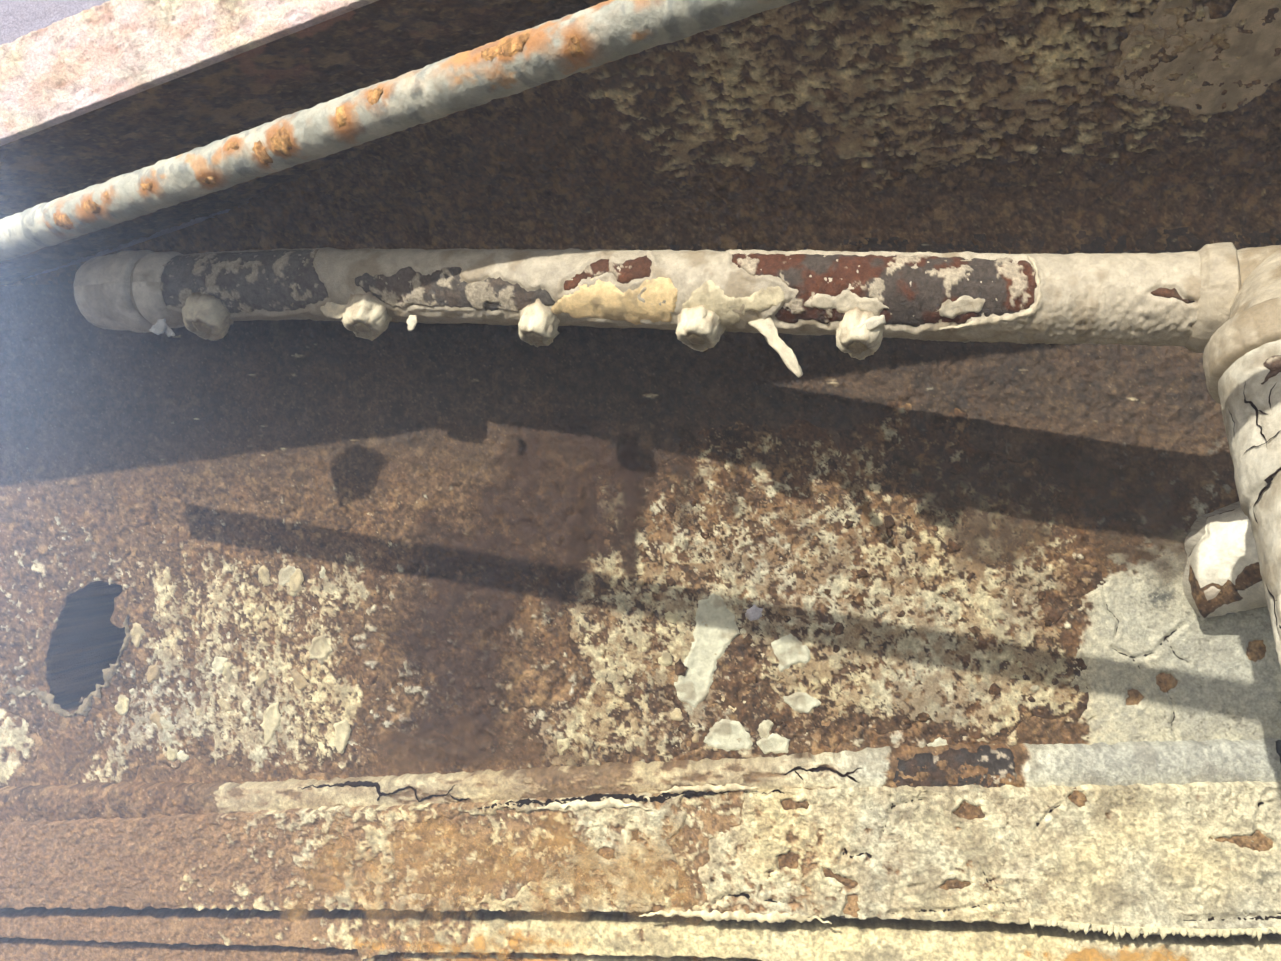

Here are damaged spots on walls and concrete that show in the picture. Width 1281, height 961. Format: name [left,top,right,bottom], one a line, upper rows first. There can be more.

peeling [1115,0,1281,116]
peeling [352,255,652,331]
peeling [732,253,1042,378]
crack [1228,383,1281,523]
peeling [514,400,1106,767]
peeling [63,512,399,785]
rust [675,658,688,676]
rust [1246,640,1266,662]
crack [299,781,469,802]
crack [744,766,860,794]
rust [893,745,1017,788]
rust [1064,948,1187,961]